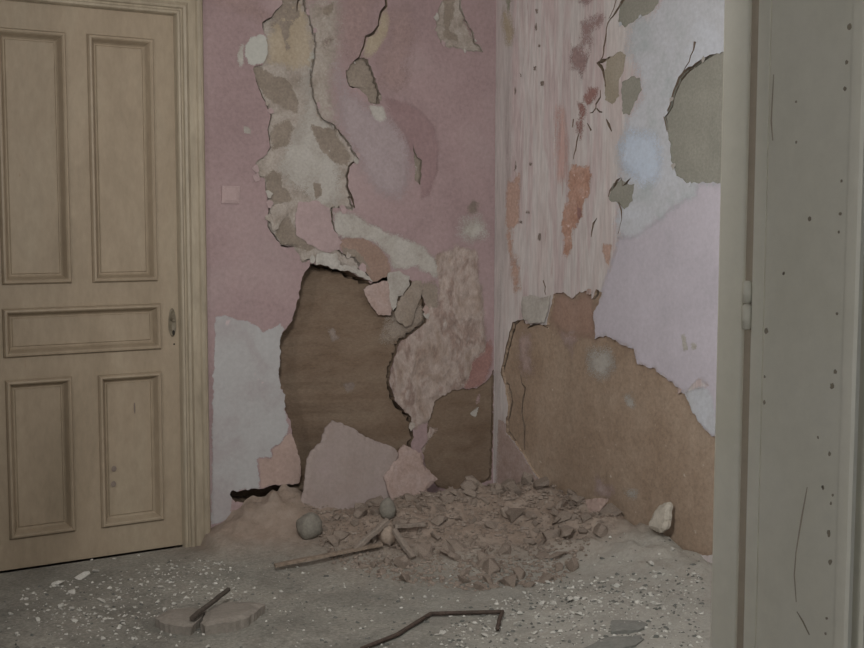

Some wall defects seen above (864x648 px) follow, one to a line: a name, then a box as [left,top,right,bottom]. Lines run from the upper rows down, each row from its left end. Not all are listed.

flaking render [230,0,724,556]